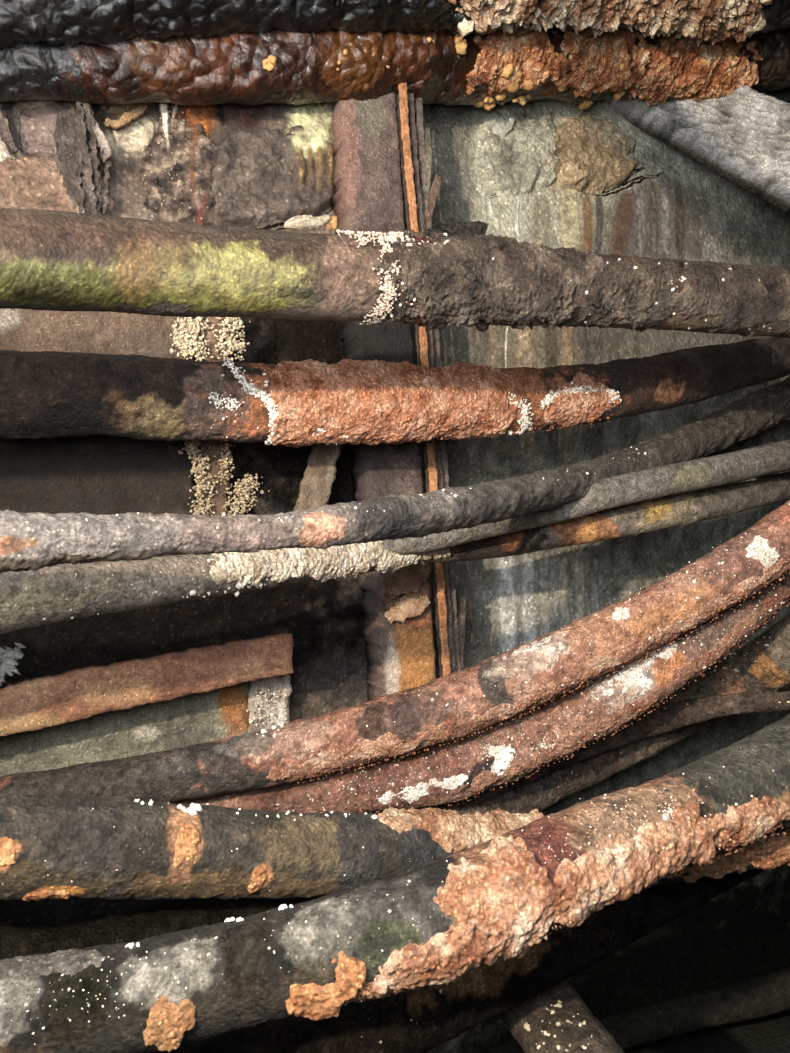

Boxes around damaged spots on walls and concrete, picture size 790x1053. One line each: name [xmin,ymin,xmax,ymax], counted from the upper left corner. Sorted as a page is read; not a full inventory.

corrosion [464,28,763,107]
efflorescence [336,229,413,325]
corrosion [264,83,790,493]
efflorescence [170,317,279,445]
efflorescence [207,541,451,589]
corrosion [266,558,790,793]
corrosion [0,836,16,866]
corrosion [22,890,71,902]
corrosion [173,823,200,868]
corrosion [247,865,267,894]
corrosion [285,795,790,1021]